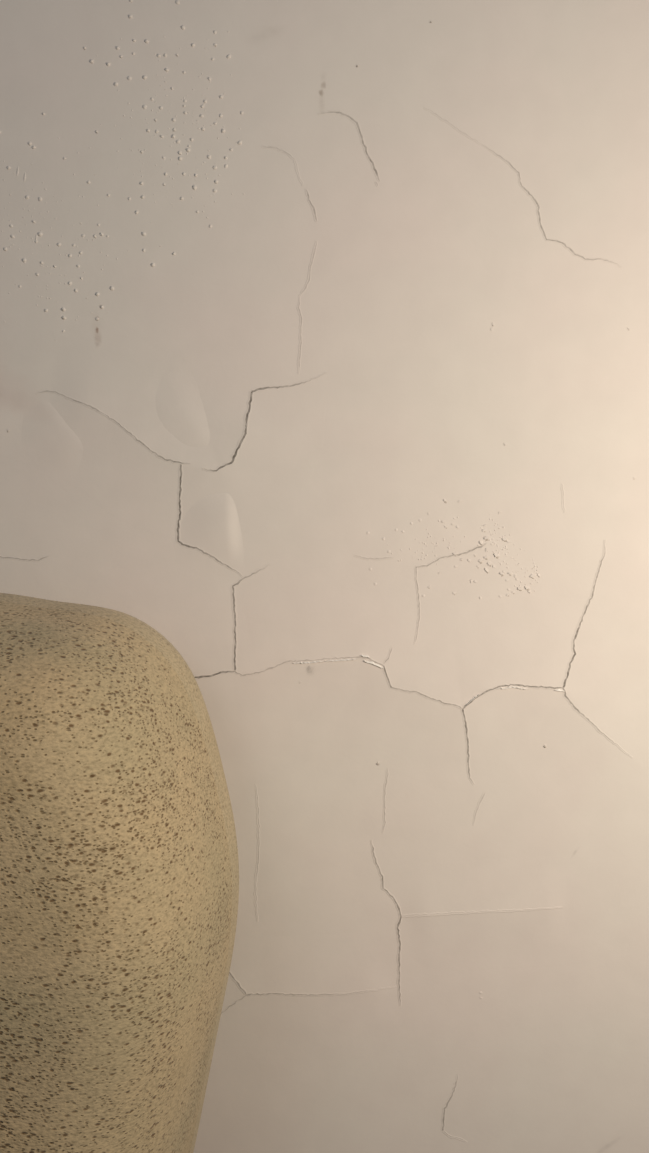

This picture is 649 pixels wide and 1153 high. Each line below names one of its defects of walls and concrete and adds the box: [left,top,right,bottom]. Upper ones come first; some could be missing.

crack [318,110,381,186]
crack [423,106,622,268]
crack [36,145,633,825]
crack [220,768,563,1017]